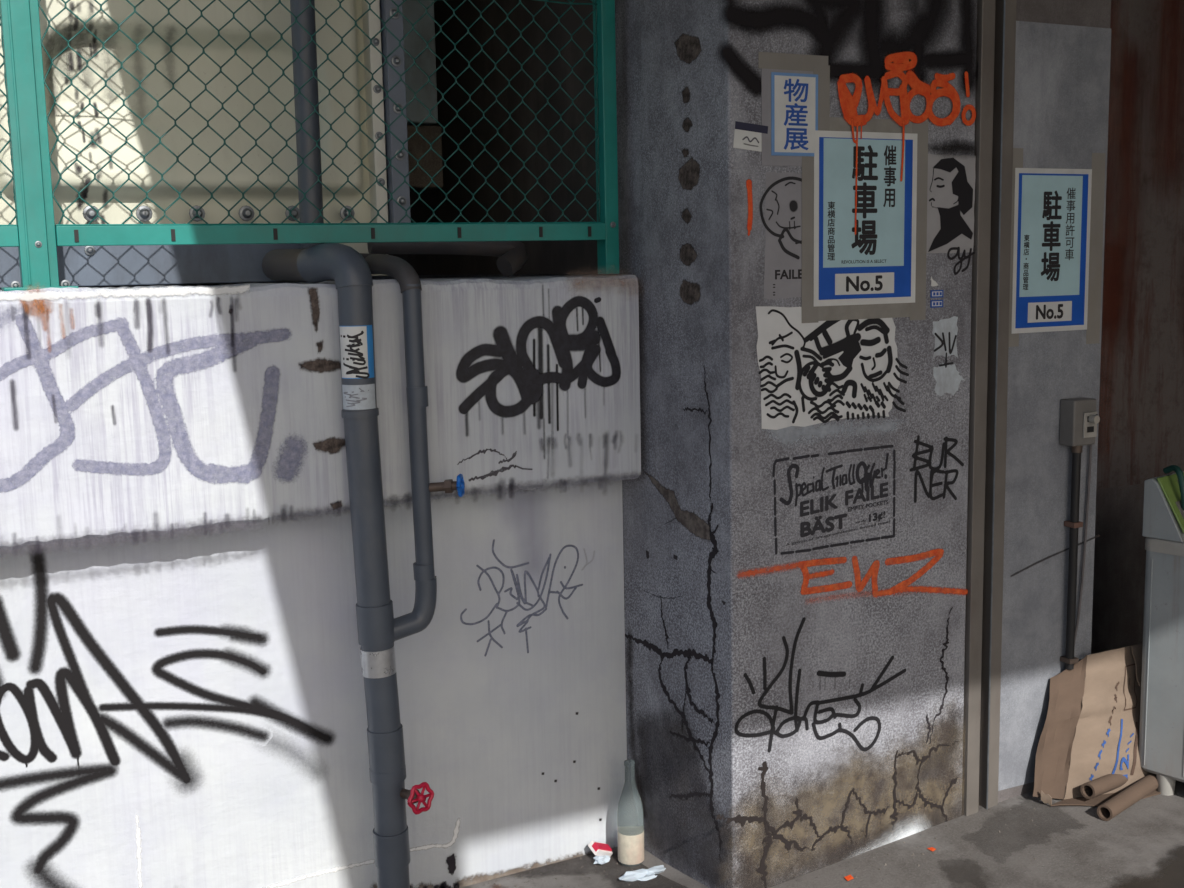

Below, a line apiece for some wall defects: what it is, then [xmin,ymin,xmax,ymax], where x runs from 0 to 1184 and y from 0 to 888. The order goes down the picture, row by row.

leakage [65,31,101,143]
leakage [75,164,99,209]
leakage [0,507,348,554]
crack [625,367,958,888]
leakage [627,633,965,888]
leakage [520,853,684,888]